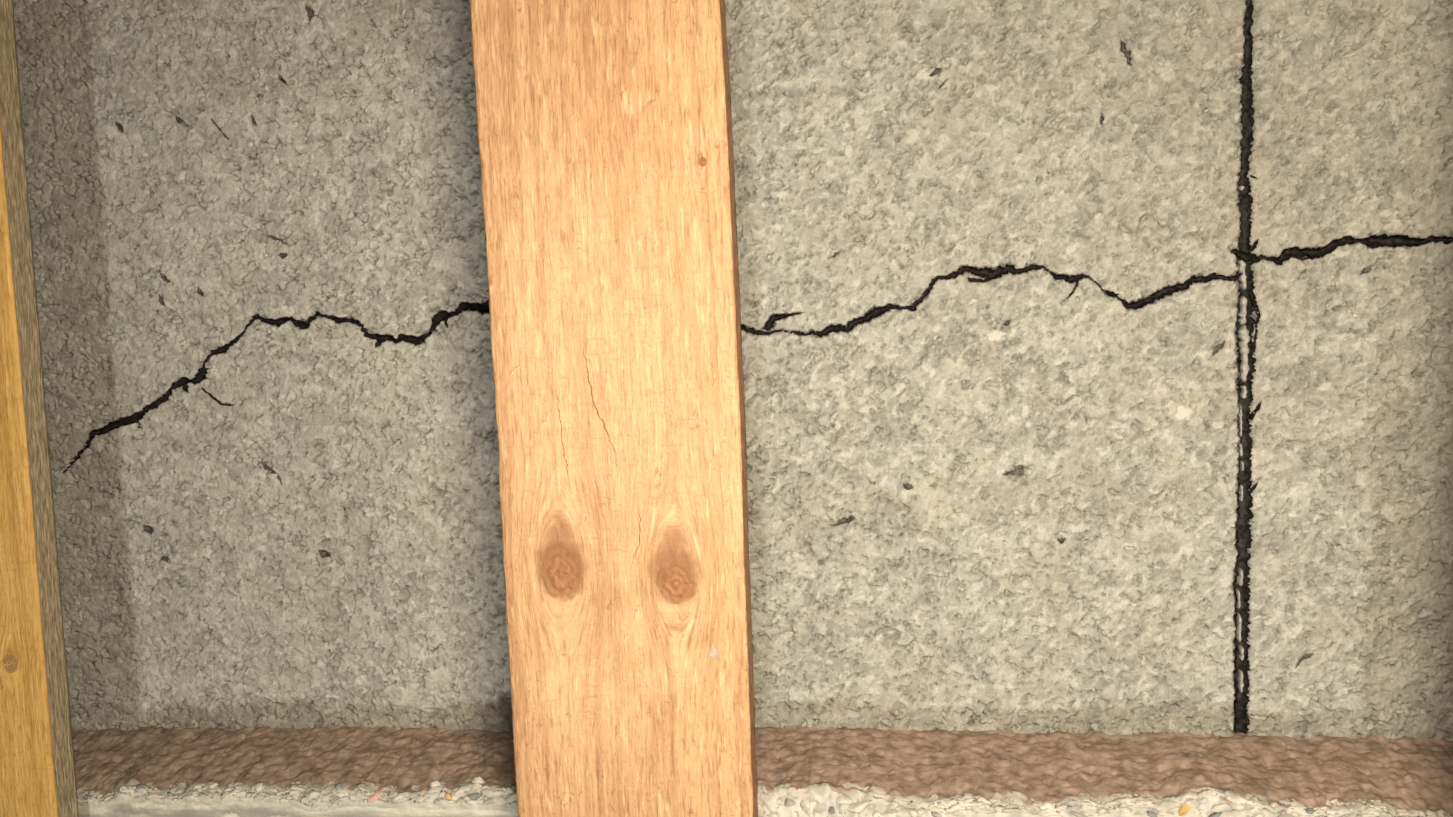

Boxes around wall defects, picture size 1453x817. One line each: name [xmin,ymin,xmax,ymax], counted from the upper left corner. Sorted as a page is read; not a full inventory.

crack [268,235,289,258]
crack [741,234,1453,337]
crack [63,300,490,473]
crack [261,462,282,485]
crack [1295,654,1314,668]